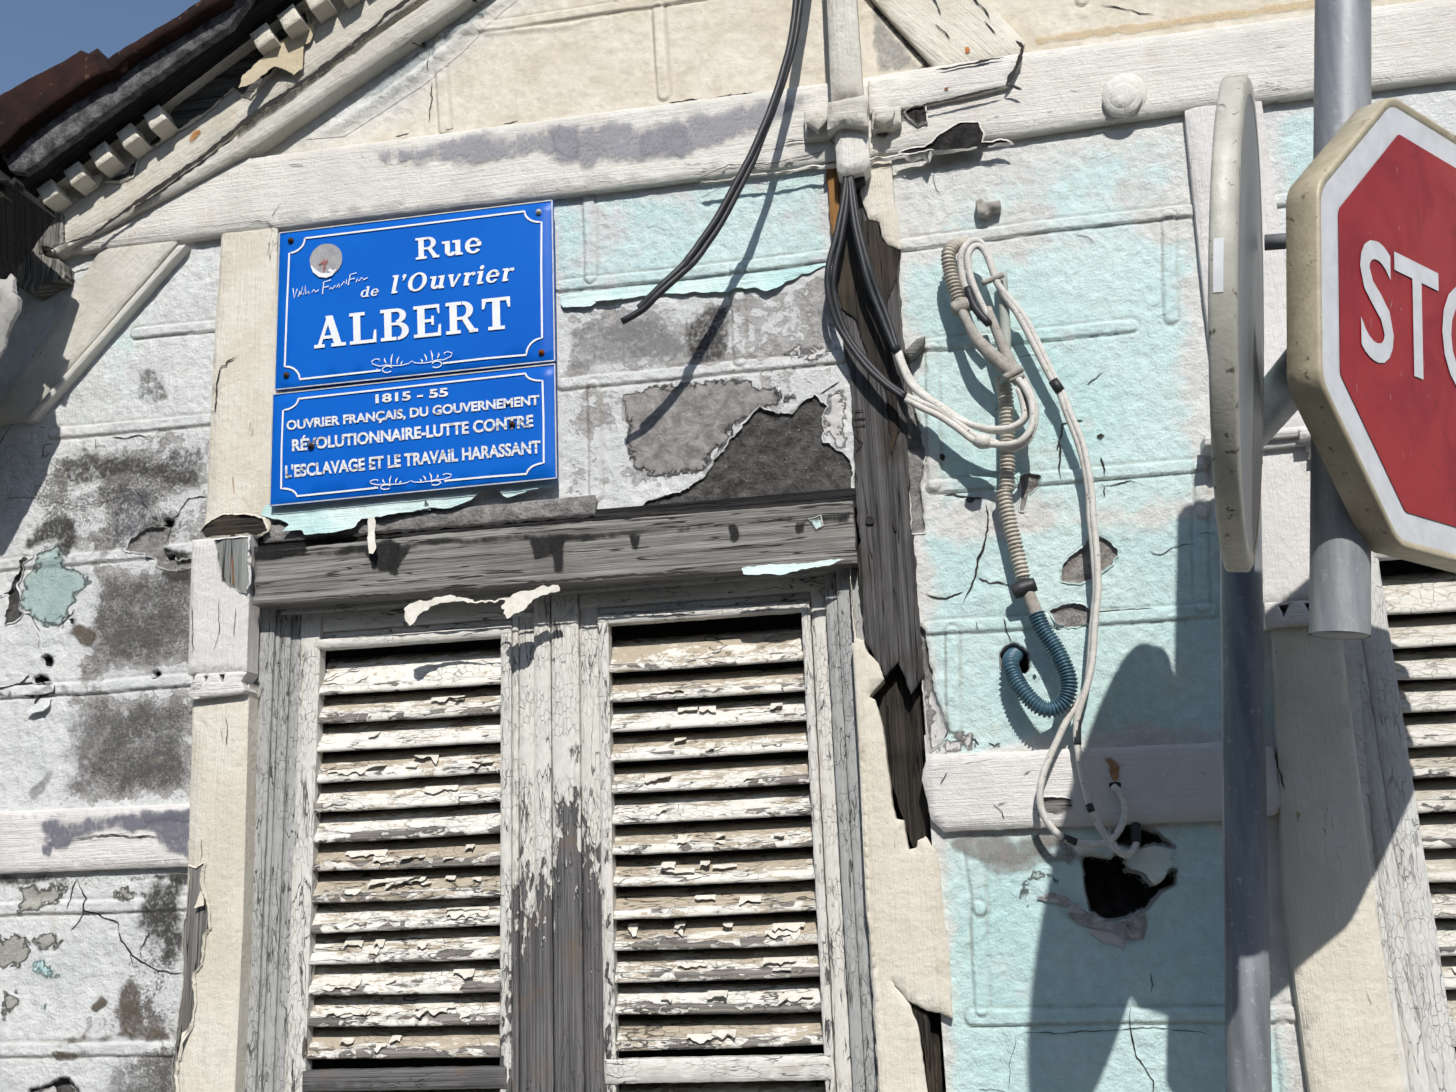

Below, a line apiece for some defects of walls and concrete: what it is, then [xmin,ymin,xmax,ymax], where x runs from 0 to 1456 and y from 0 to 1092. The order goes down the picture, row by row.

leakage [382,99,801,166]
spalling [622,378,855,506]
peeling [0,544,92,627]
leakage [161,550,191,580]
leakage [70,624,96,646]
crack [77,832,157,840]
peeling [344,844,482,895]
crack [67,879,179,974]
peeling [763,922,805,971]
peeling [415,1003,470,1019]
crack [979,975,1208,1092]
spalling [28,1077,79,1092]